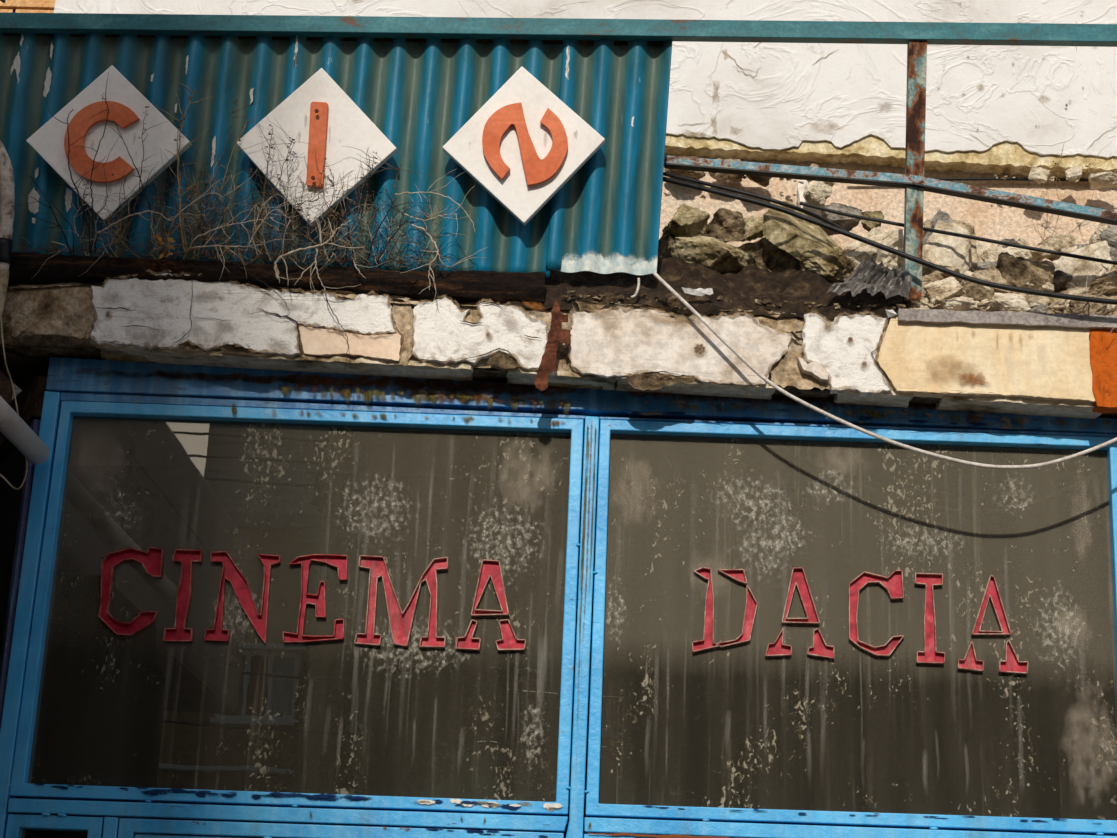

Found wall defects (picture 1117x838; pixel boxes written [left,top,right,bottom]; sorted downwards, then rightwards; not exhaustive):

peeling [548,252,658,275]
corrosion [77,299,576,425]
flaking render [7,270,1102,429]
corrosion [629,391,1030,424]